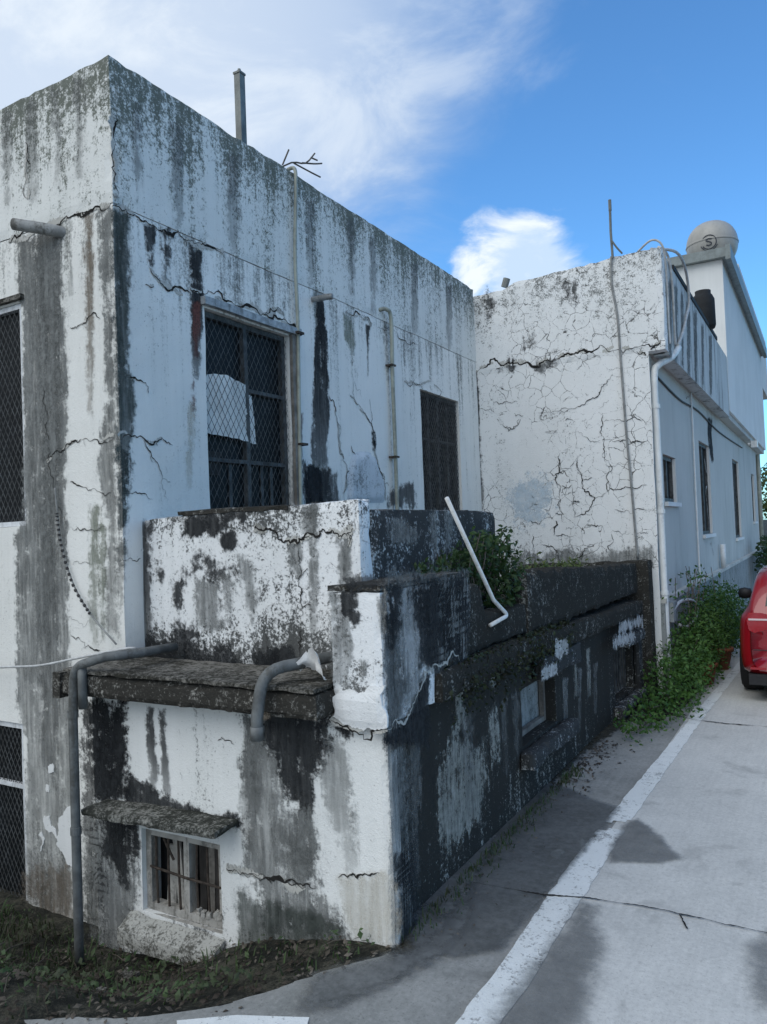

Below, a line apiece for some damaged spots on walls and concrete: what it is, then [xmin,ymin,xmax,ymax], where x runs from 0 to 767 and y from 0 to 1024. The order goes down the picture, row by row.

corrosion [192,301,201,353]
crack [145,267,296,327]
crack [42,391,172,531]
crack [476,340,661,562]
damp [13,208,200,950]
damp [142,509,297,665]
damp [288,301,471,940]
crack [226,863,314,894]
damp [222,714,353,926]
crack [338,871,378,879]
damp [442,783,619,956]
damp [611,820,678,862]